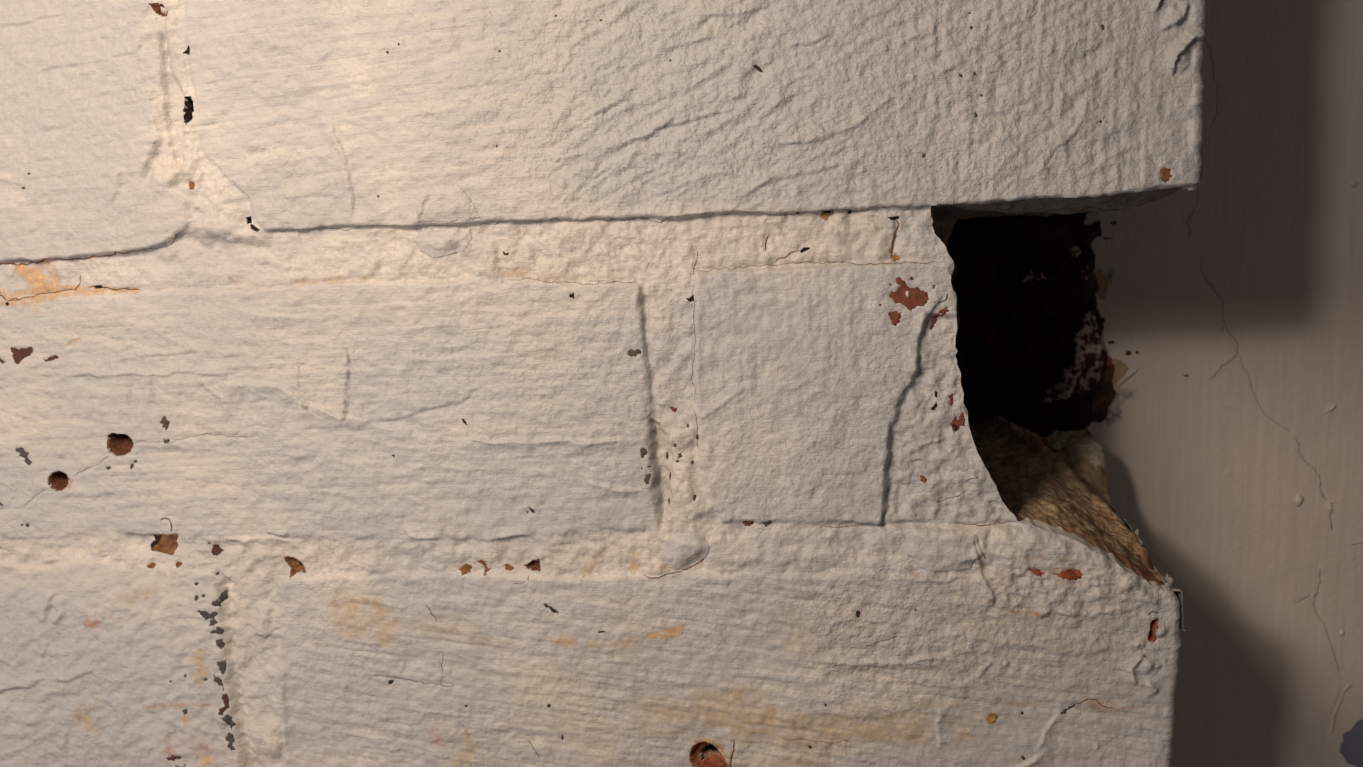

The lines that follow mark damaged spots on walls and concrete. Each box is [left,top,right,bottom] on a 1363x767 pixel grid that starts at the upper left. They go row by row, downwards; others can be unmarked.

peeling [0,347,59,364]
spalling [879,167,1193,631]
crack [1187,38,1333,531]
spalling [699,744,719,760]